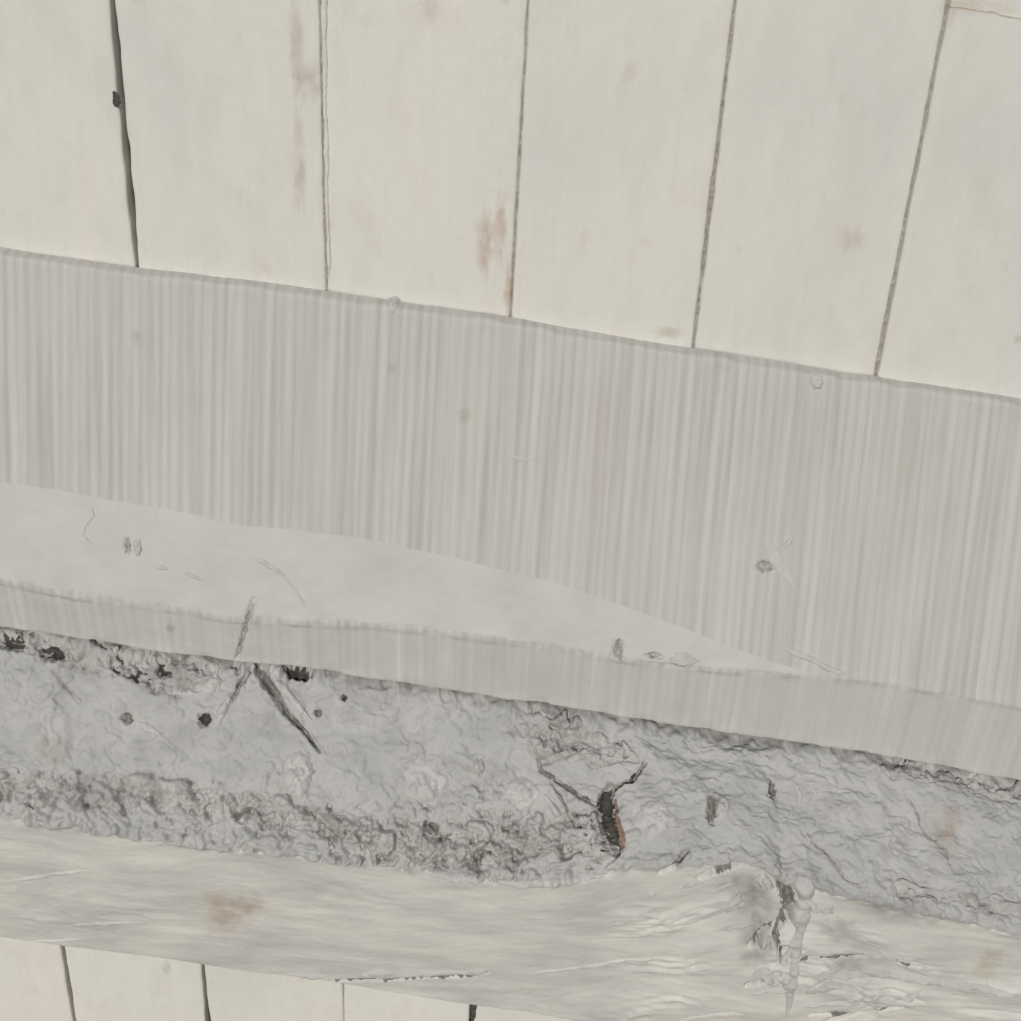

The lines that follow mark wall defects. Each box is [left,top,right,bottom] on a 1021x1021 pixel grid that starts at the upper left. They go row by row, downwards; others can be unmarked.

crack [949,6,1021,20]
spalling [0,631,212,697]
crack [234,602,317,748]
spalling [509,707,639,769]
spalling [0,767,611,875]
crack [538,759,645,855]
spalling [880,759,1021,803]
crack [749,879,864,961]
spalling [894,878,1021,918]
crack [830,1010,848,1018]